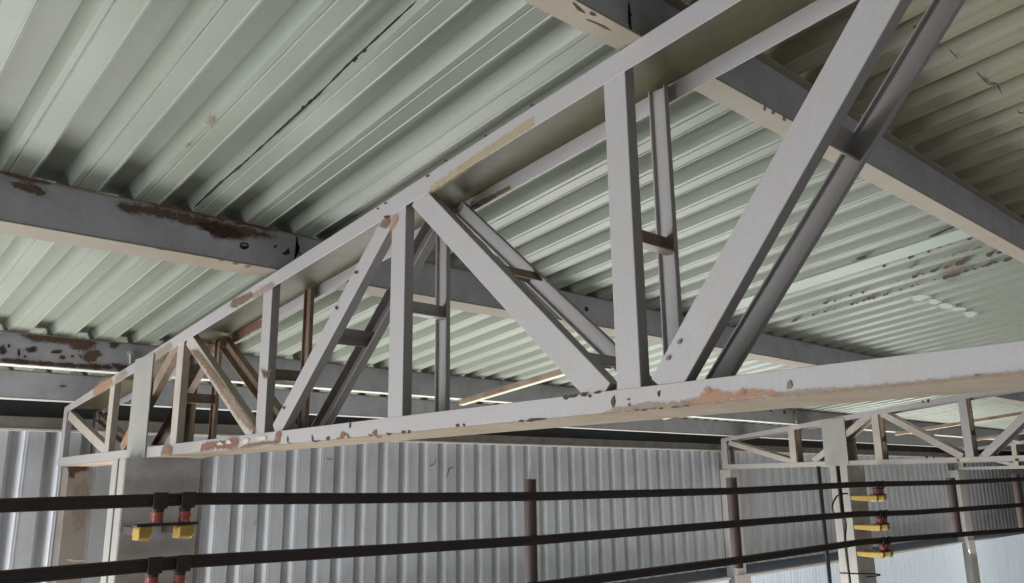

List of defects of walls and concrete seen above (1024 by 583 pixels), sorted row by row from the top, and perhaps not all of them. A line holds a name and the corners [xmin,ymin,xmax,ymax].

rust [2,172,51,196]
rust [117,202,278,240]
rust [229,283,273,308]
peeling [910,294,977,317]
rust [189,350,255,431]
peeling [563,390,690,411]
peeling [200,431,291,452]